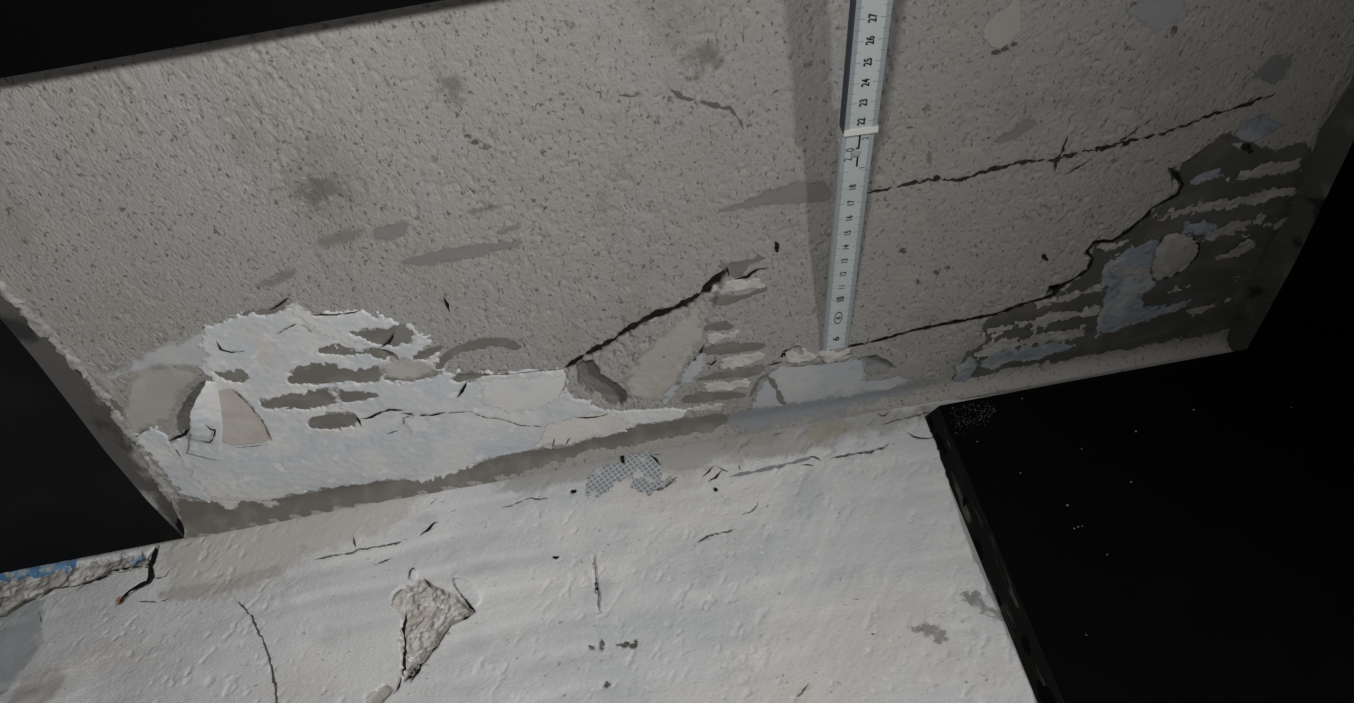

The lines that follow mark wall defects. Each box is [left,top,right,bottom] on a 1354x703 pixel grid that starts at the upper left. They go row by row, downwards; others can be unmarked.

crack [867,93,1276,193]
crack [848,168,1184,347]
spalling [952,114,1312,383]
peeling [107,241,909,538]
spalling [0,554,153,617]
crack [113,546,169,619]
crack [236,601,278,703]
spalling [366,567,482,703]